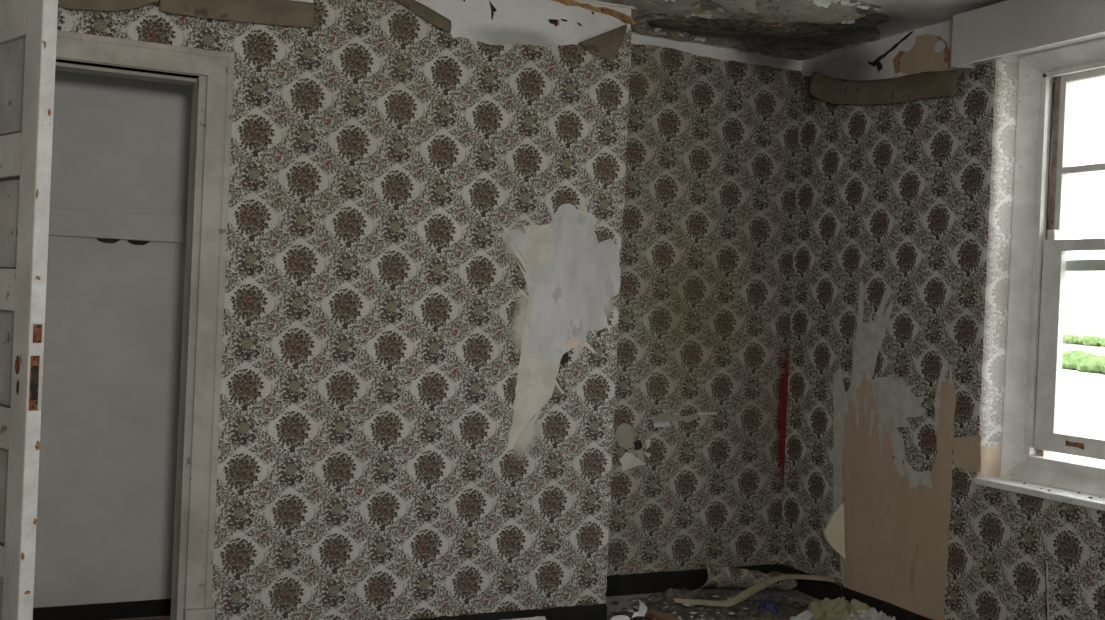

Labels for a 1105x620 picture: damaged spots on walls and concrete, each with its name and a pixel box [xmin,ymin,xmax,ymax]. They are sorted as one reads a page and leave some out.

peeling [551,0,889,61]
peeling [501,201,621,455]
peeling [823,273,1002,620]